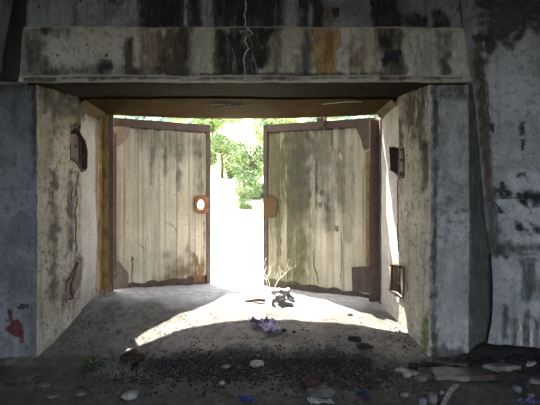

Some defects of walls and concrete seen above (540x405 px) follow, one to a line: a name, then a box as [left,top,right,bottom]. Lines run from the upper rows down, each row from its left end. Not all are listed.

damp [0,0,451,118]
crack [228,0,258,75]
corrosion [312,6,341,75]
crack [71,172,79,250]
damp [406,0,540,353]